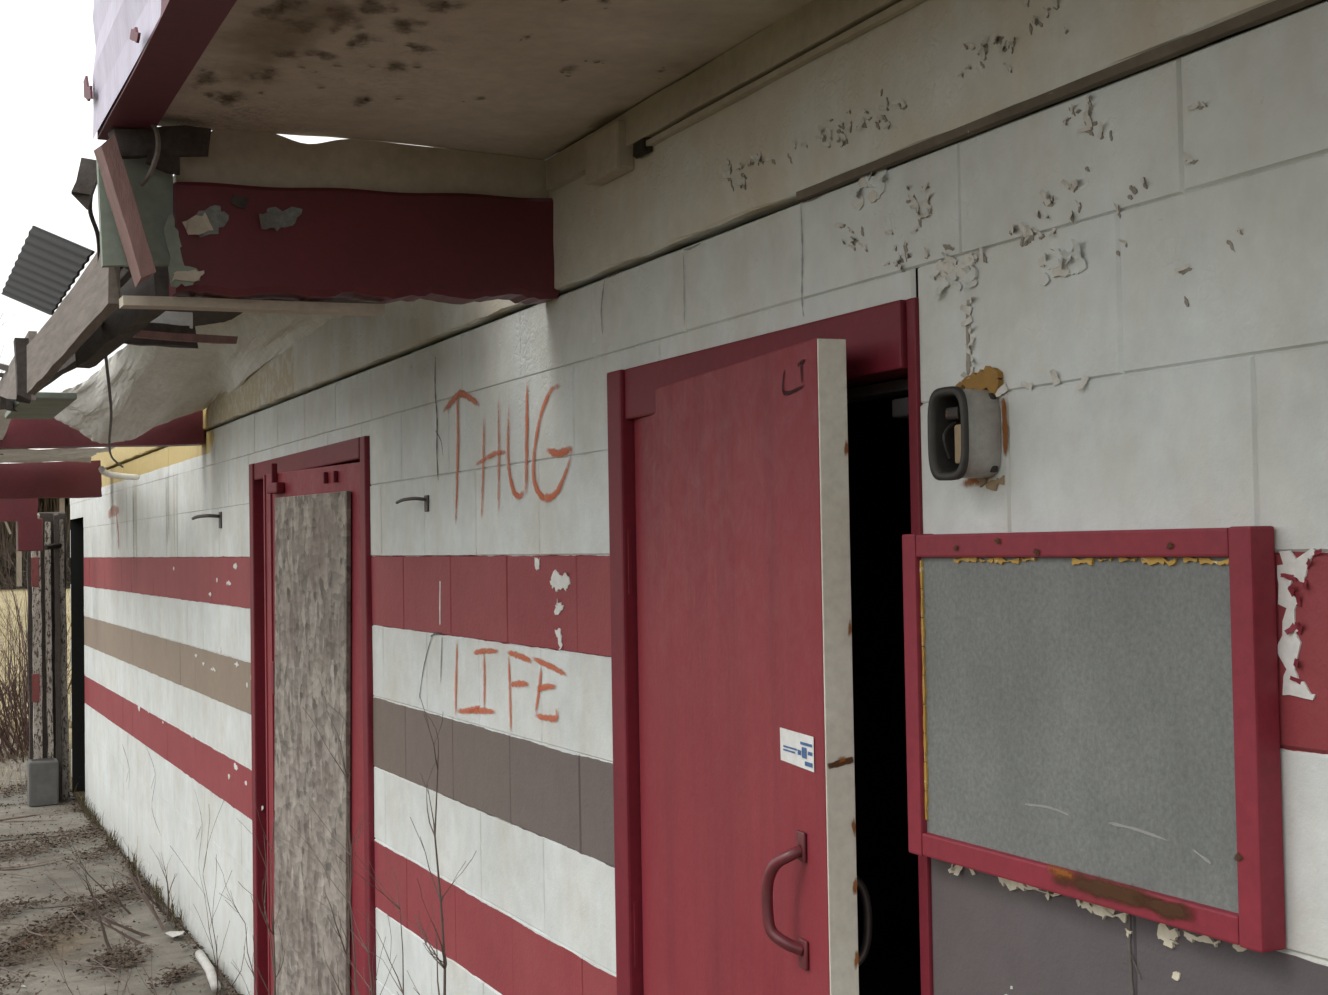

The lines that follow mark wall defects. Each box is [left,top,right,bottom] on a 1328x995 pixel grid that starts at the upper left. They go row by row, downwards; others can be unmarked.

peeling [163,194,303,288]
peeling [883,181,987,379]
peeling [1009,166,1090,286]
corrosion [955,366,1008,455]
corrosion [964,475,1005,491]
peeling [534,557,571,650]
peeling [1277,548,1322,700]
peeling [948,864,975,876]
peeling [998,877,1061,900]
peeling [1076,899,1133,937]
corrosion [1049,865,1192,919]
peeling [1157,923,1247,952]